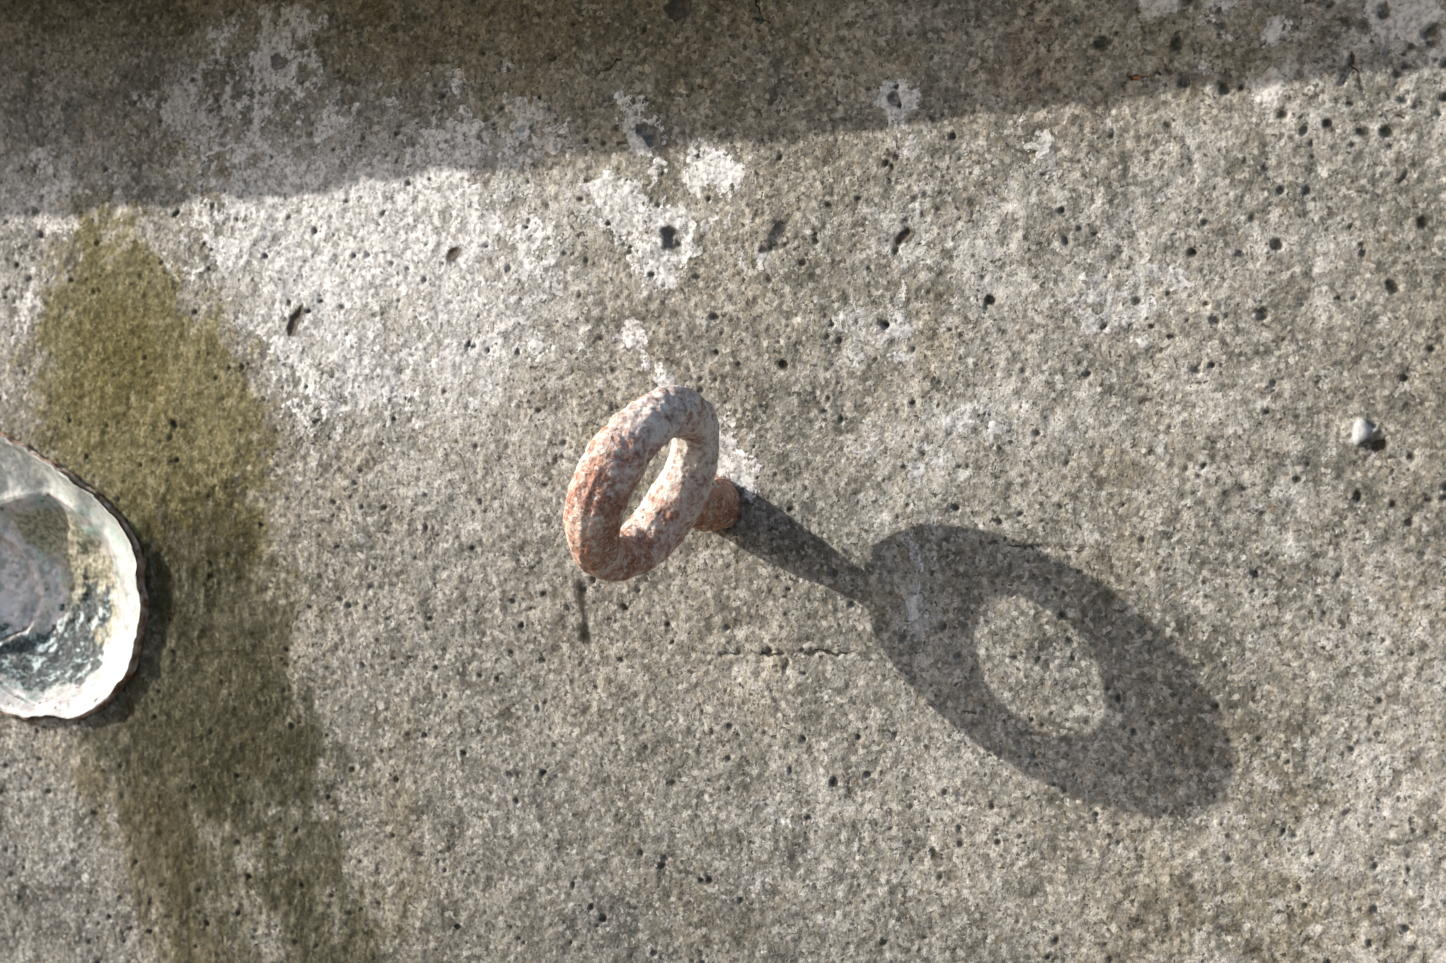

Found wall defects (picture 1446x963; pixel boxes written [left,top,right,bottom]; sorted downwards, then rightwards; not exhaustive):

damp [167,845,252,963]
damp [255,806,377,963]